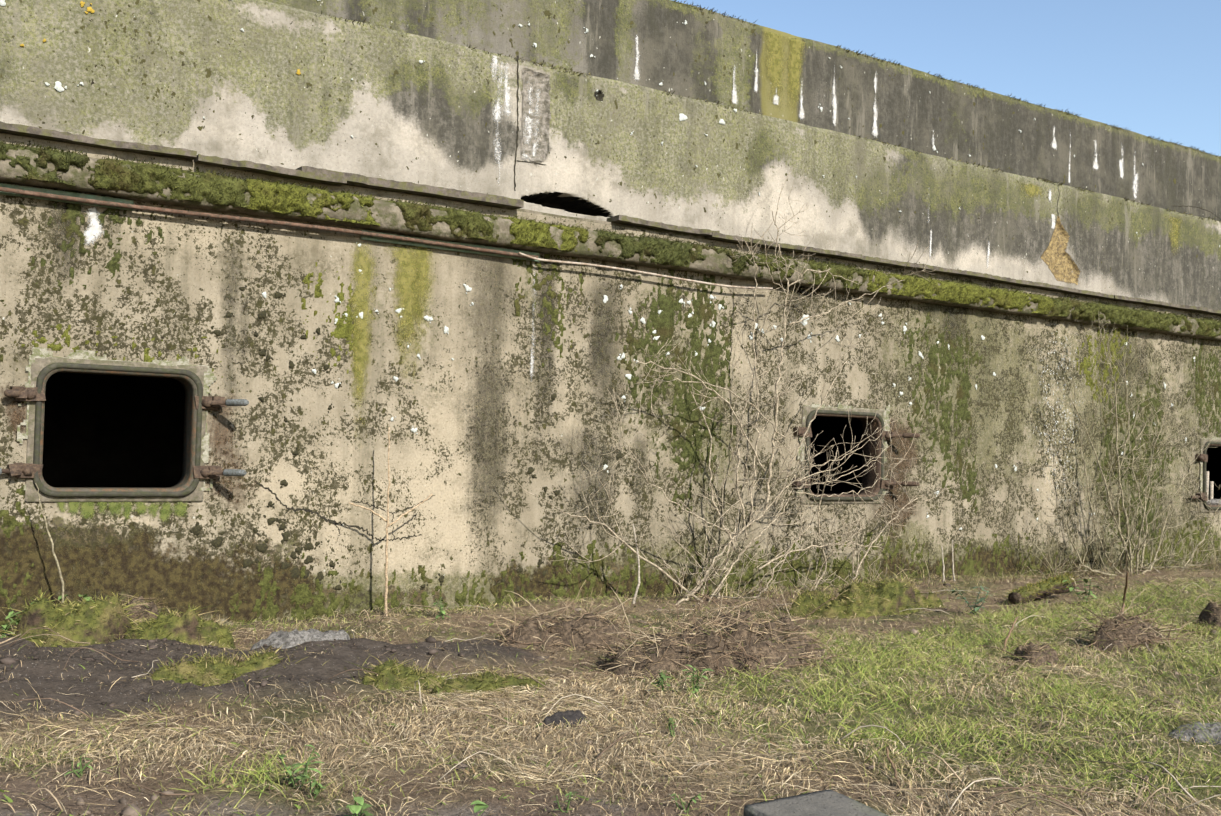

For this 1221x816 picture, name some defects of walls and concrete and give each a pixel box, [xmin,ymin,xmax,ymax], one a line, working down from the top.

efflorescence [492,56,511,168]
efflorescence [523,86,539,157]
hole [521,192,613,217]
water stain [1021,184,1055,229]
water stain [1119,151,1138,198]
spalling [1040,216,1081,285]
corrosion [5,396,25,432]
corrosion [209,407,241,498]
corrosion [882,419,916,526]
crack [255,481,435,541]